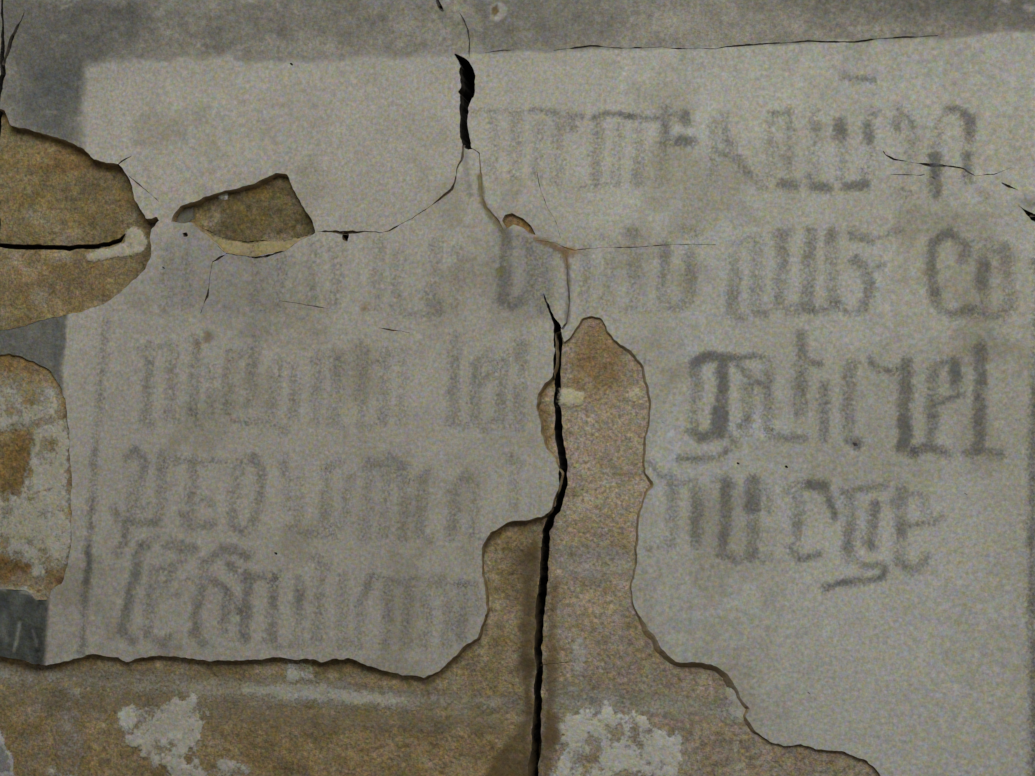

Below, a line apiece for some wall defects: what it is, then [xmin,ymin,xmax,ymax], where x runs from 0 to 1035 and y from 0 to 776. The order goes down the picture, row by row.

crack [0,0,24,135]
crack [117,156,159,202]
flaking render [0,109,315,330]
crack [320,0,508,241]
crack [554,35,938,51]
flaking render [0,316,880,776]